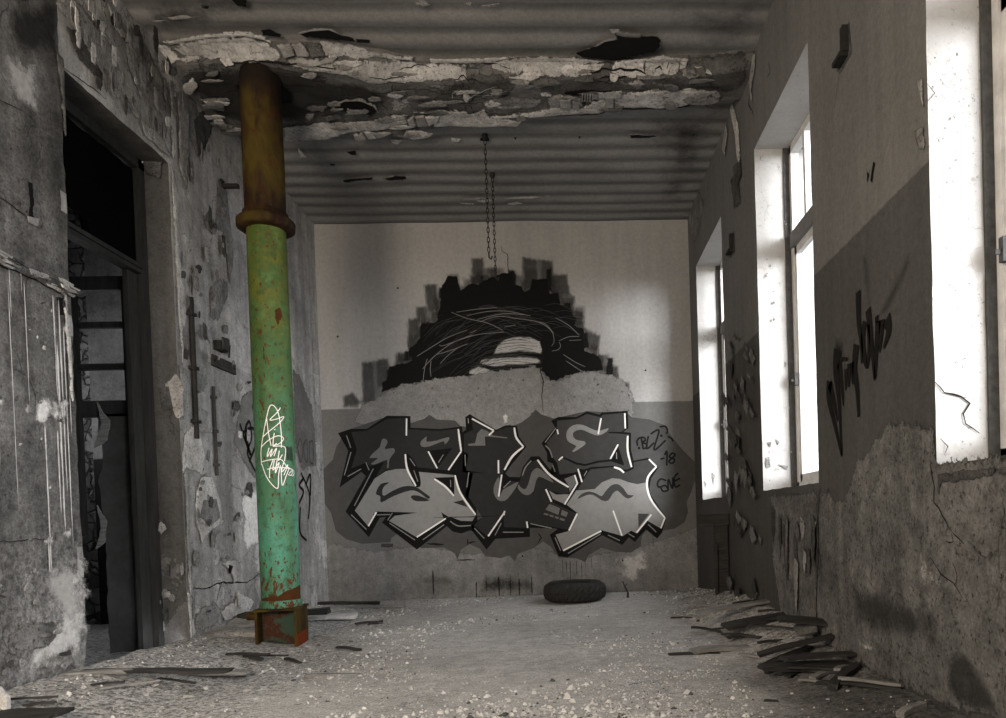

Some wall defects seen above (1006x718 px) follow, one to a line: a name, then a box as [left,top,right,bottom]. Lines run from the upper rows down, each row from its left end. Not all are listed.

peeling [41,292,74,401]
spalling [56,0,755,638]
crack [935,382,979,433]
peeling [704,332,1006,718]
crack [930,440,964,597]
corrosion [262,585,301,601]
corrosion [296,629,308,647]